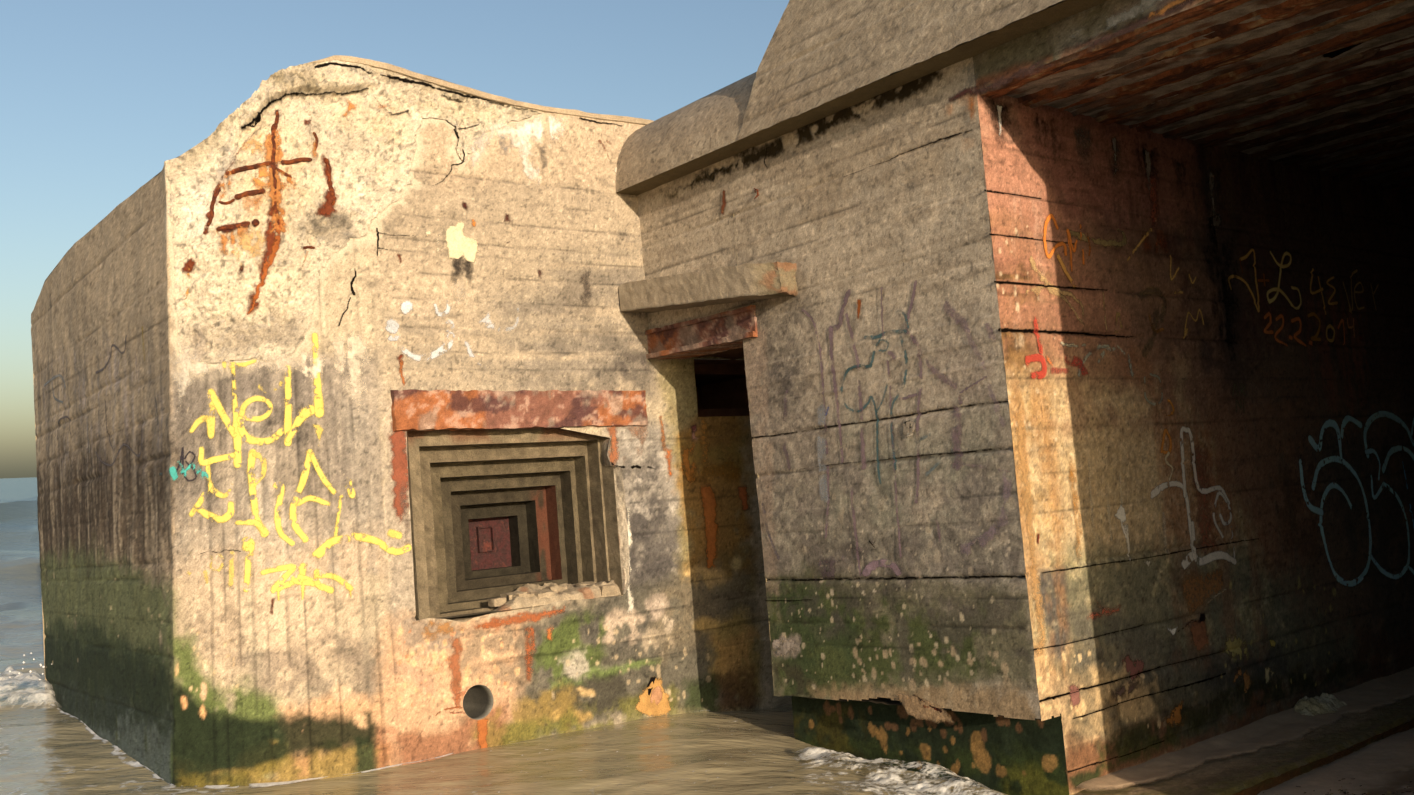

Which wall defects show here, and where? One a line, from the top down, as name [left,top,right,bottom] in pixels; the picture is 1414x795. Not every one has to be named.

crack [241,62,535,184]
crack [580,117,623,126]
corrosion [948,87,977,118]
corrosion [203,110,295,315]
corrosion [312,142,337,217]
spalling [164,60,542,363]
spalling [897,694,952,723]